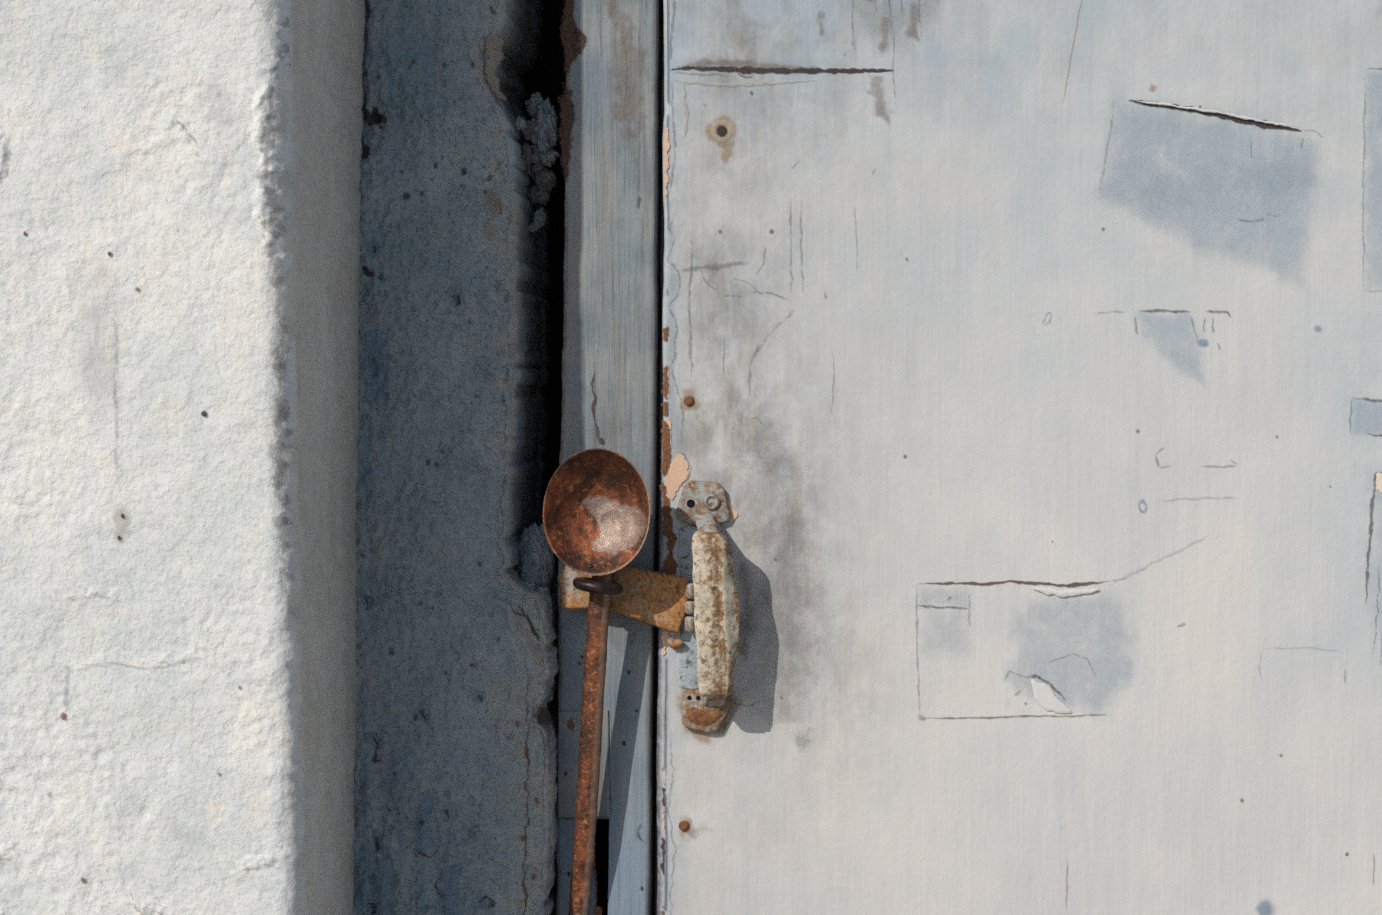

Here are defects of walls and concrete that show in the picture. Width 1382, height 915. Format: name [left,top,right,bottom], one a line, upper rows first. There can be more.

peeling [560,0,586,72]
crack [671,66,894,94]
spalling [482,35,574,233]
peeling [1128,100,1301,131]
peeling [1366,472,1382,597]
peeling [919,580,1105,609]
corrosion [687,707,724,726]
peeling [931,674,1105,719]